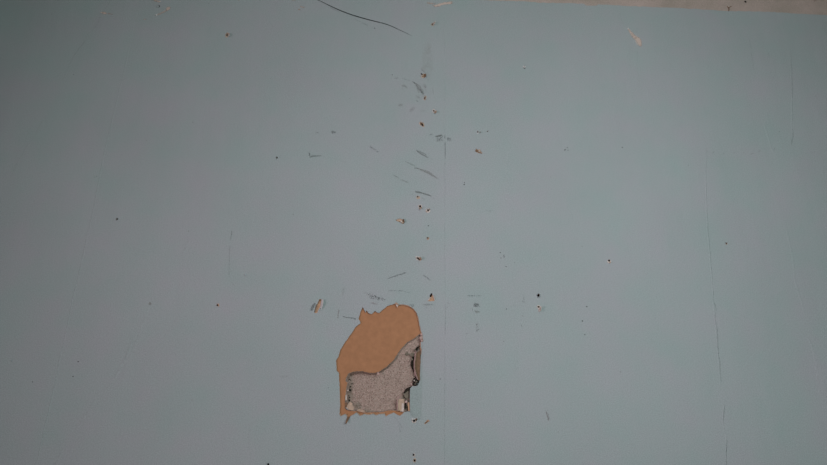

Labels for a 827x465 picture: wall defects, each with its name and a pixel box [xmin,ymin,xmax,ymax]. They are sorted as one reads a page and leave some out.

peeling [336,303,423,423]